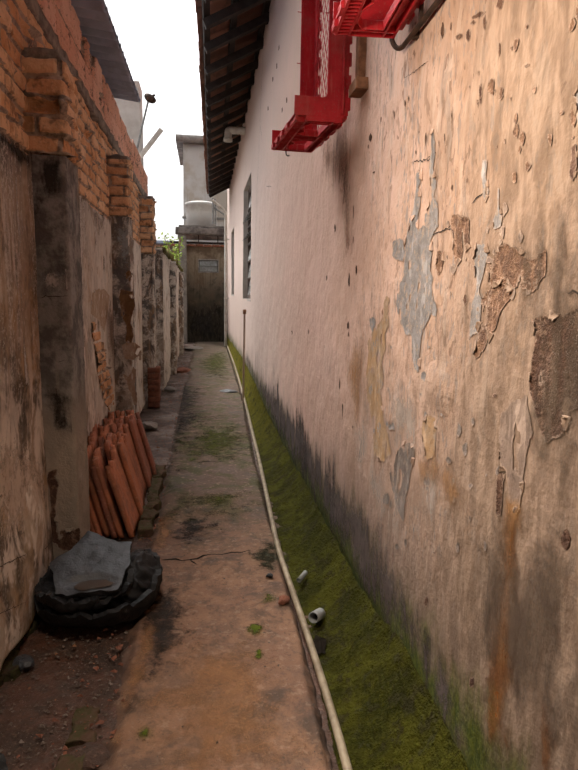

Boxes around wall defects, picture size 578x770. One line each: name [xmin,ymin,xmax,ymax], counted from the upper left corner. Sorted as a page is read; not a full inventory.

peeling [469,70,511,106]
peeling [496,112,525,153]
leakage [0,134,32,240]
leakage [326,137,348,246]
flaking render [91,322,114,411]
flaking render [119,269,142,409]
flaking render [148,366,161,408]
peeling [366,129,546,521]
flaking render [485,308,578,517]
crack [164,550,249,564]
leakage [246,359,456,720]